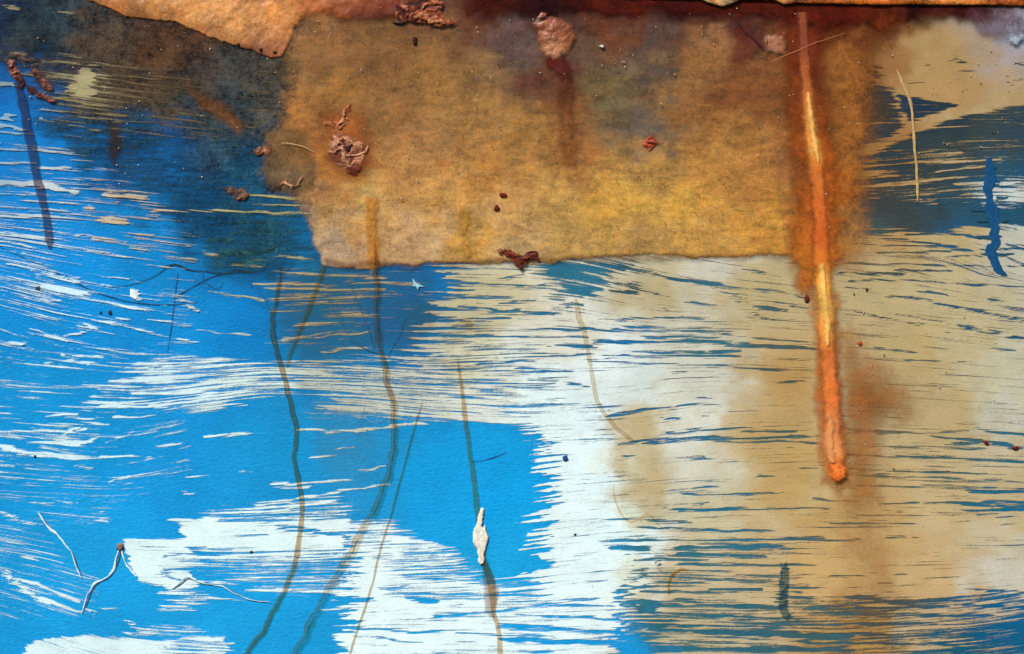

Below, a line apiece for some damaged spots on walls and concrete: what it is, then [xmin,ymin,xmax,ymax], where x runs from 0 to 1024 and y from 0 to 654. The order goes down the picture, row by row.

corrosion [7,51,57,103]
corrosion [253,0,1024,495]